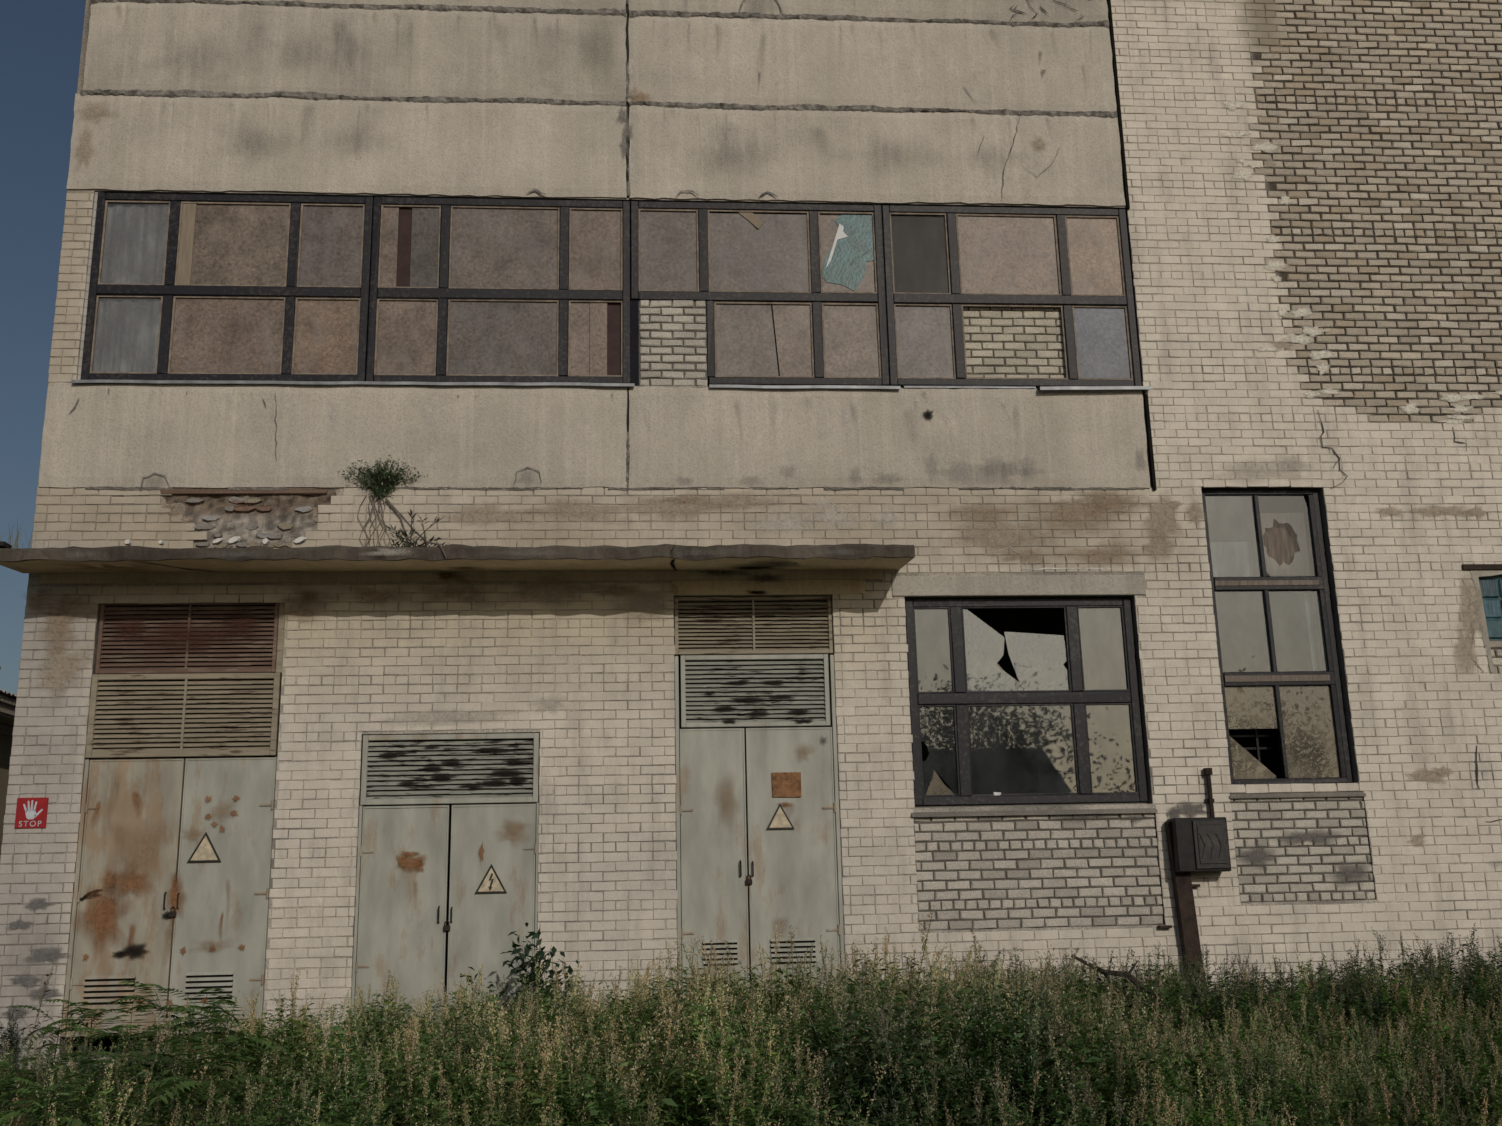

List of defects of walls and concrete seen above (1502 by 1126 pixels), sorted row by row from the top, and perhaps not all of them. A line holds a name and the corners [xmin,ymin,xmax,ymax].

crack [1010,0,1084,20]
peeling [1222,0,1502,424]
crack [1317,409,1348,488]
spalling [112,472,337,548]
water stain [708,562,795,594]
corrosion [191,796,239,837]
corrosion [398,852,424,872]
corrosion [80,837,150,960]
corrosion [163,878,182,919]